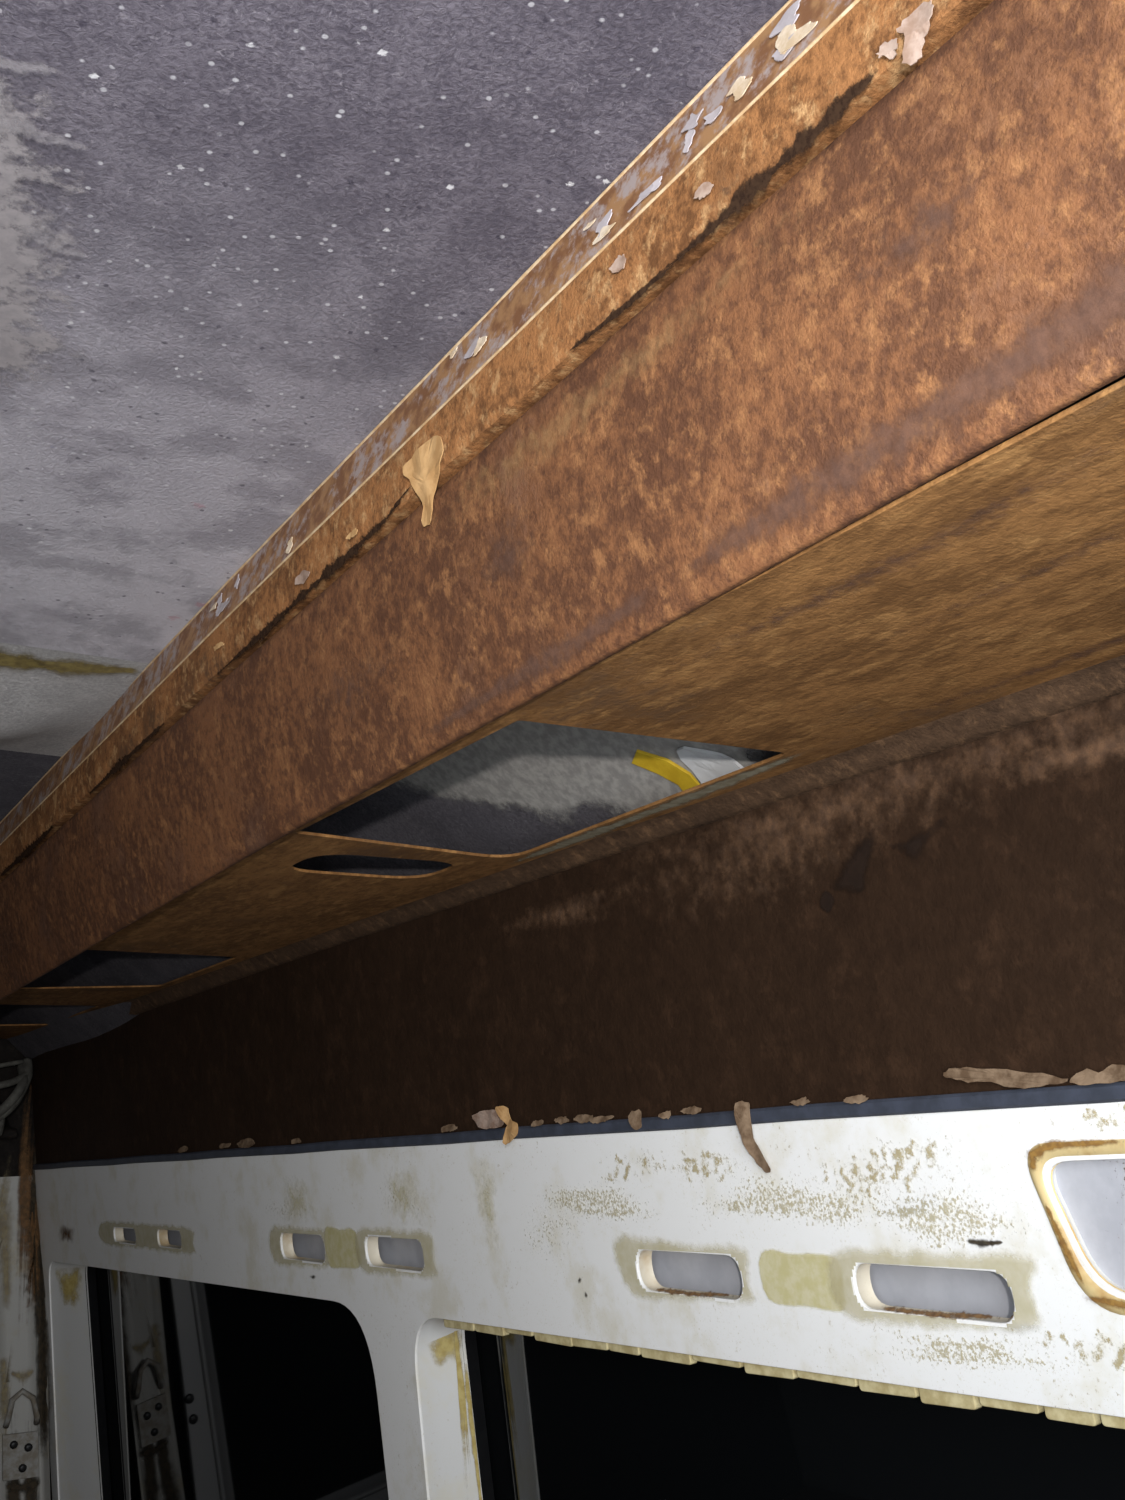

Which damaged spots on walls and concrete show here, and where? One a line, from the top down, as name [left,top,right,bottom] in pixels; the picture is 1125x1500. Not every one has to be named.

peeling [769,0,818,62]
peeling [876,0,934,66]
water stain [0,82,82,381]
crack [569,71,877,351]
peeling [403,435,444,527]
crack [217,487,410,675]
peeling [943,1064,1125,1089]
peeling [441,1106,702,1145]
rust [1029,1104,1125,1198]
rust [1046,1206,1082,1281]
rust [884,1306,1125,1370]
rust [1090,1297,1125,1309]